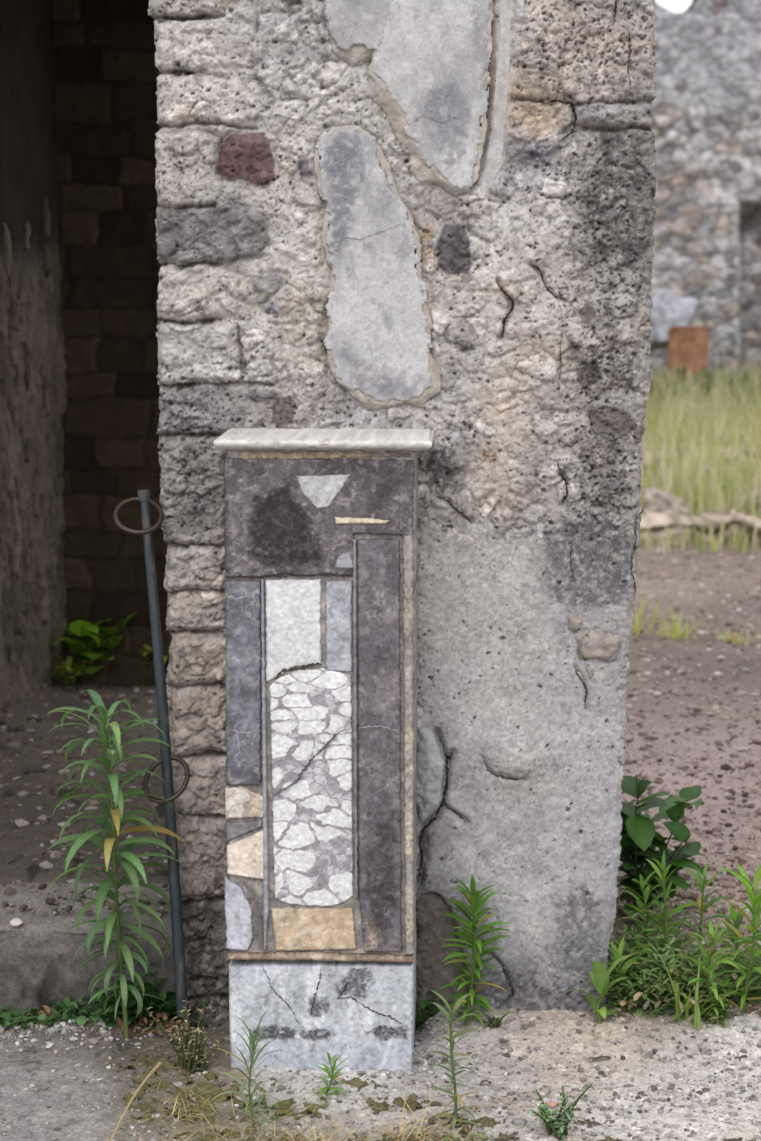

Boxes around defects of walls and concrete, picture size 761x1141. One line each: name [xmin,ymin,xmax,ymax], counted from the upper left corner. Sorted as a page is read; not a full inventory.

crack [613,0,631,89]
crack [545,100,577,140]
crack [497,282,514,337]
crack [532,265,567,397]
crack [418,731,467,883]
crack [241,880,401,1024]